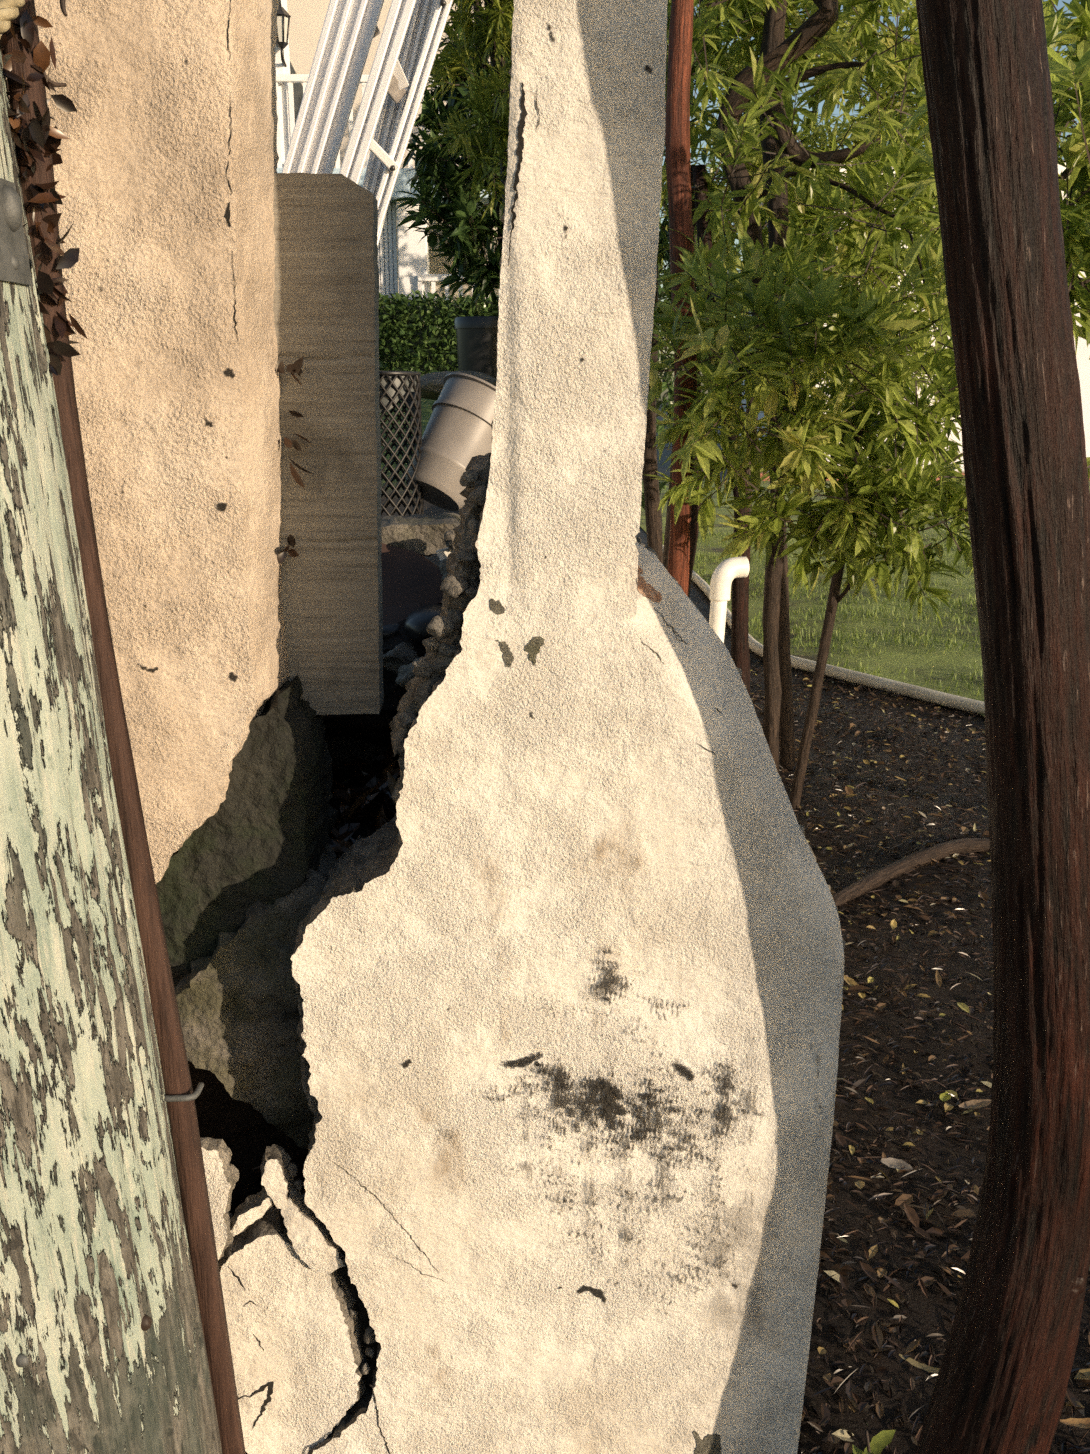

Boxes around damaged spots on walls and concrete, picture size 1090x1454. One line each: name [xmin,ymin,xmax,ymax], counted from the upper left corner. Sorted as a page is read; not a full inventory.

crack [508,82,540,265]
spalling [360,453,505,873]
peeling [496,636,545,668]
spalling [292,874,341,963]
spalling [200,1137,240,1260]
crack [279,1163,306,1231]
spalling [260,1144,347,1274]
spalling [294,981,318,1150]
crack [336,1164,446,1283]
water stain [484,947,765,1315]
crack [228,1266,274,1430]
crack [308,1266,391,1454]